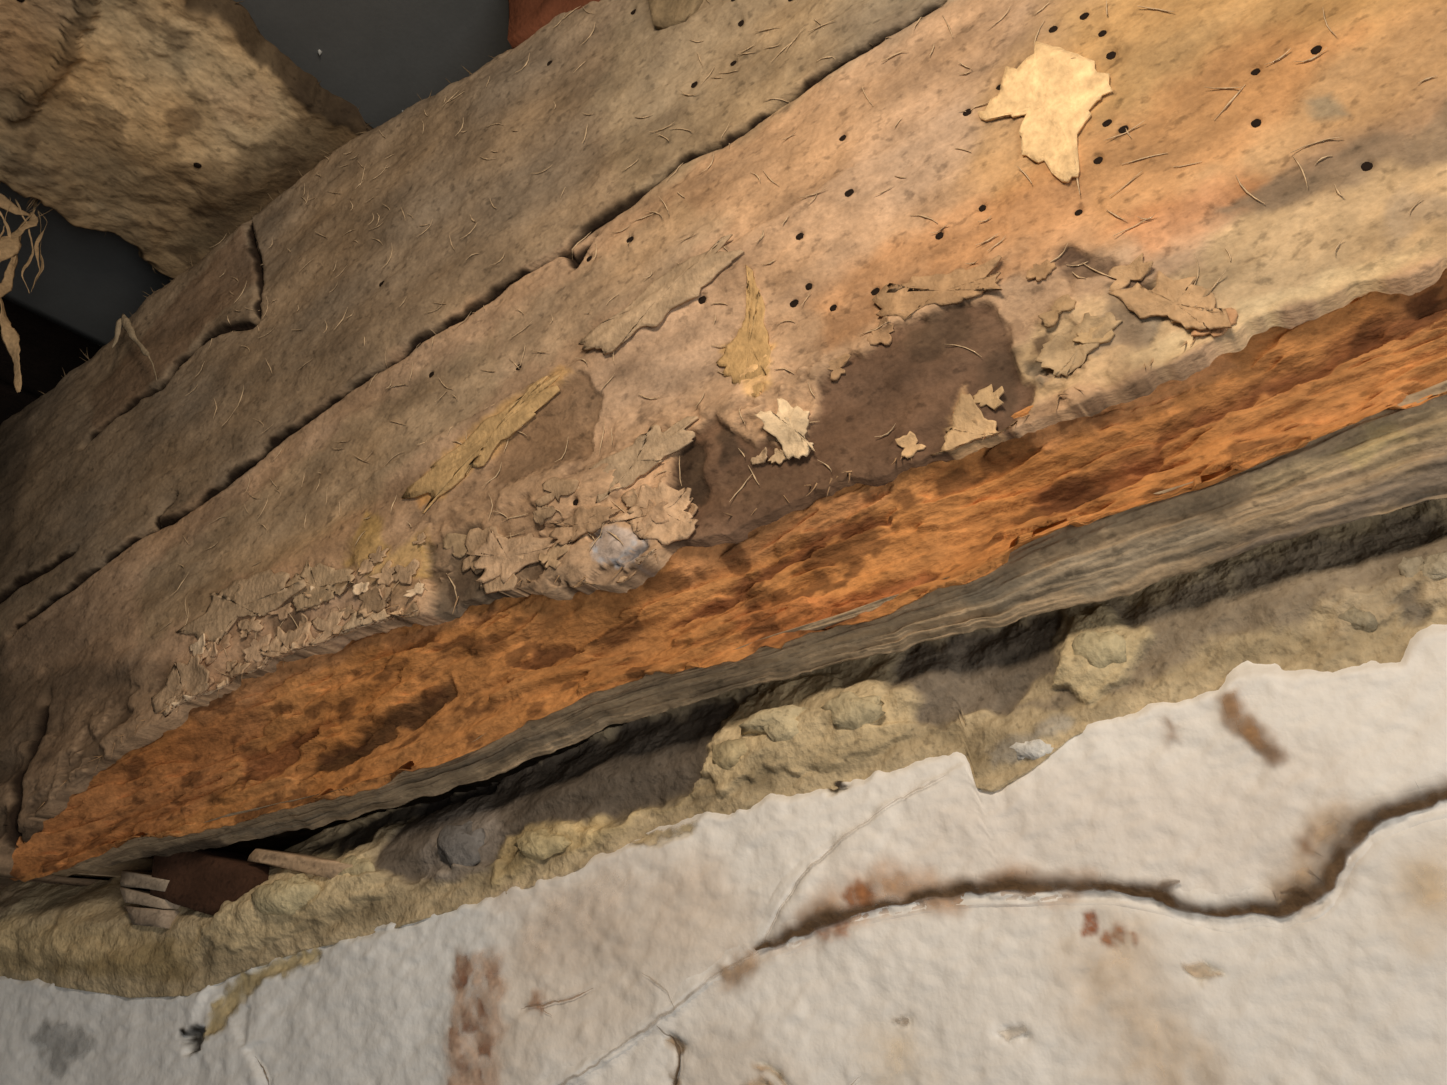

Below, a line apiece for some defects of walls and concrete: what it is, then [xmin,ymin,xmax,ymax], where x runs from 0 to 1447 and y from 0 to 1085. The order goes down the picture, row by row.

peeling [977,41,1113,183]
crack [0,6,940,629]
peeling [579,234,816,466]
peeling [867,255,1002,346]
peeling [1035,253,1238,377]
peeling [401,375,561,514]
peeling [895,384,1018,459]
peeling [151,416,699,717]
crack [6,706,49,848]
spalling [632,824,693,845]
crack [721,785,1447,972]
crack [561,976,689,1085]